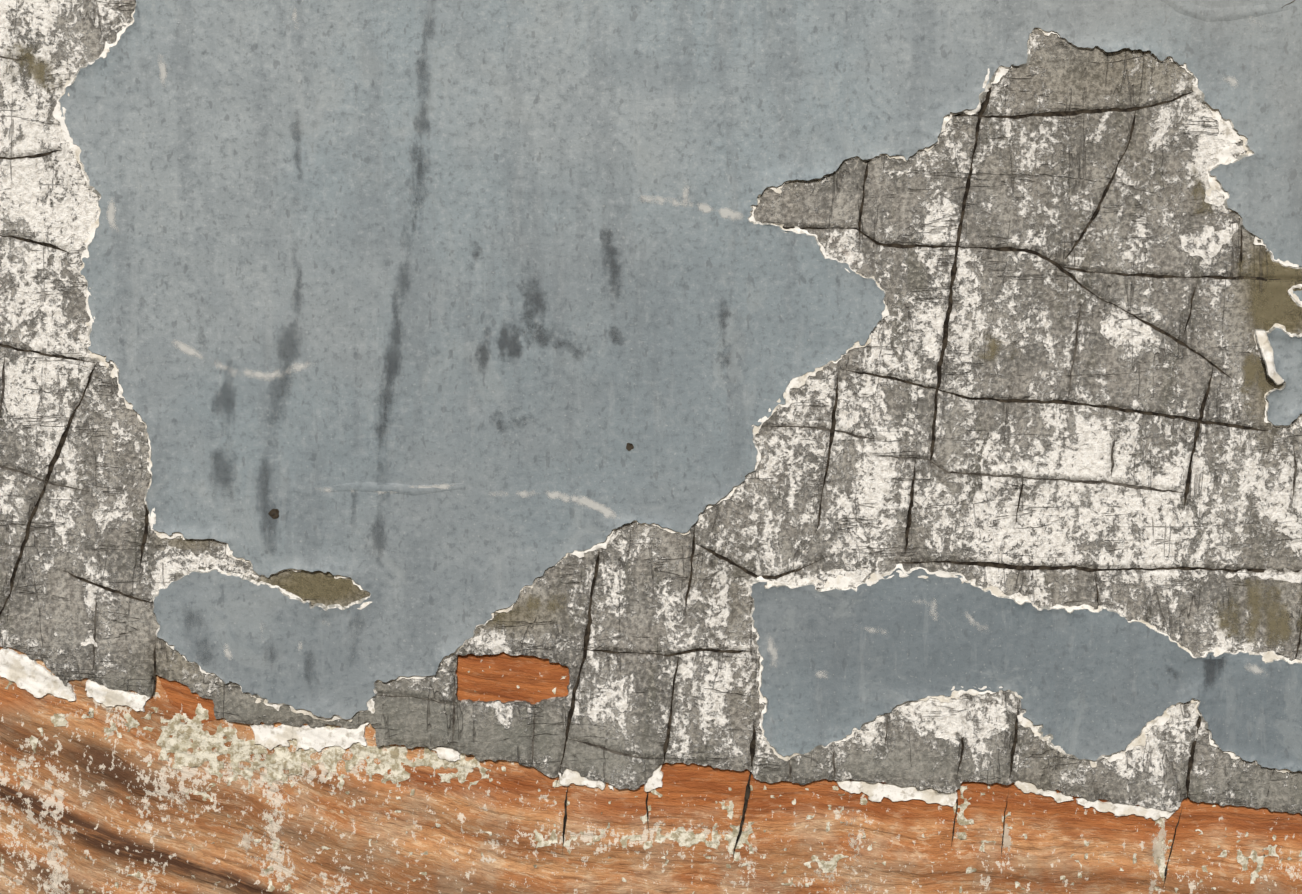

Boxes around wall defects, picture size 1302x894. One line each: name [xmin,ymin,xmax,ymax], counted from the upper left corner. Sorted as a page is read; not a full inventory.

damp [481,331,519,364]
crack [685,87,1302,612]
crack [0,343,97,615]
crack [532,550,752,852]
peeling [553,768,606,790]
peeling [644,764,663,797]
peeling [619,787,766,868]
crack [733,725,756,857]
peeling [836,780,958,814]
peeling [1013,780,1073,803]
peeling [1076,797,1175,829]
crack [1163,716,1201,887]